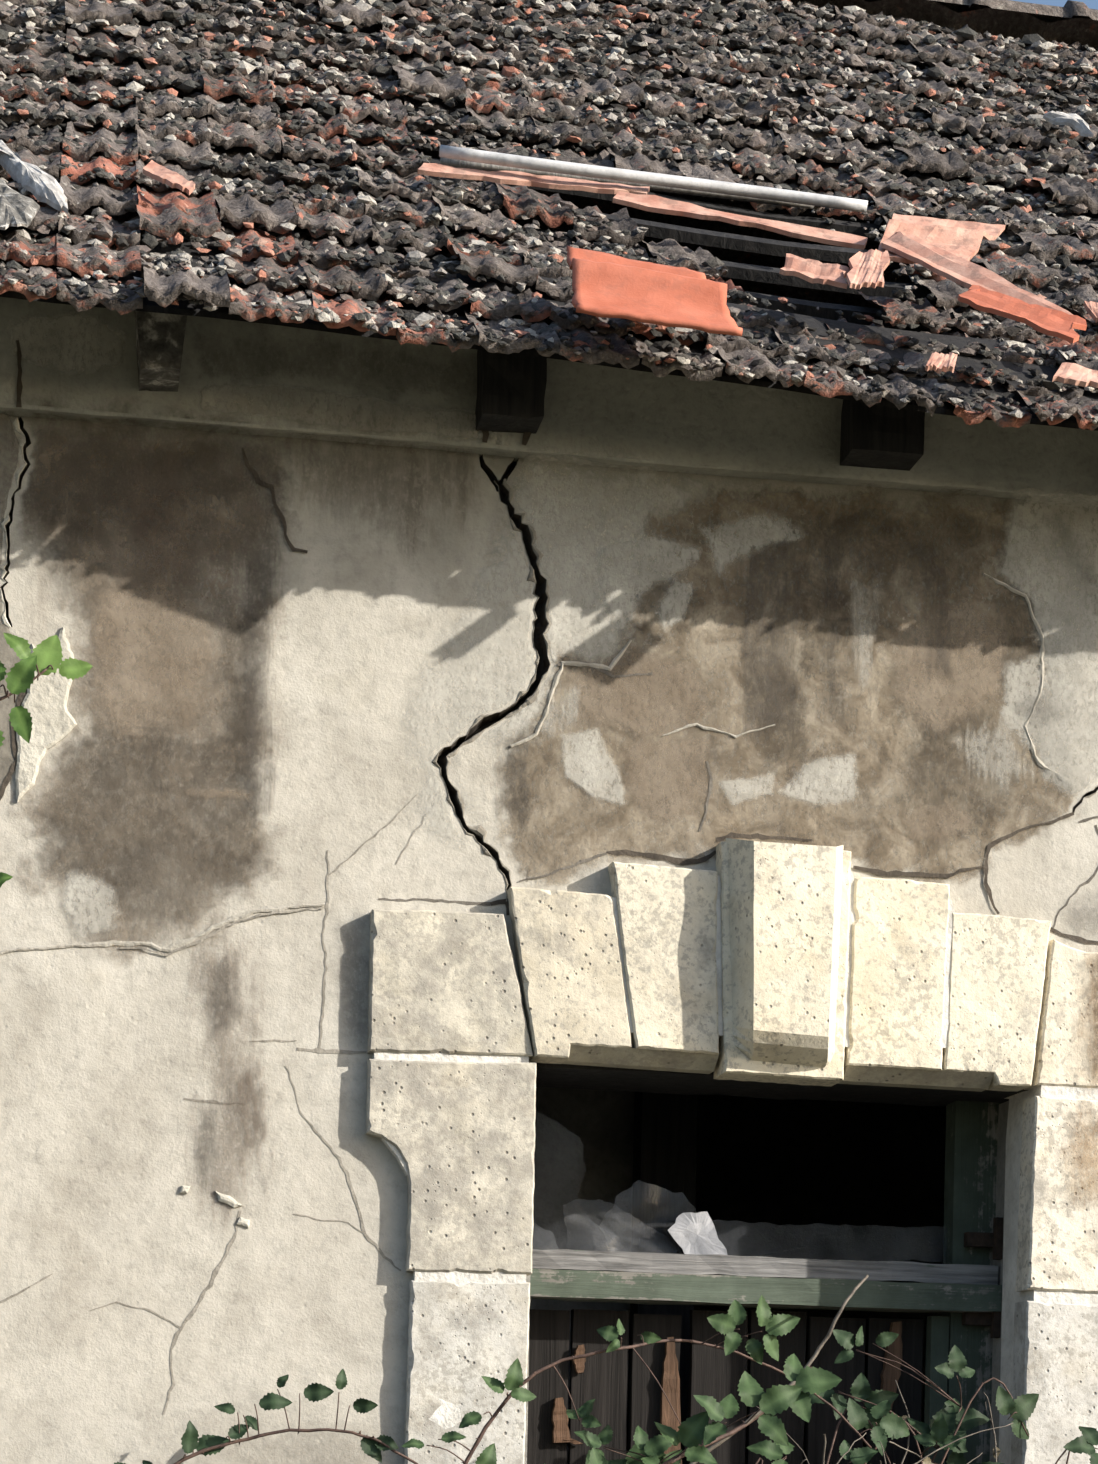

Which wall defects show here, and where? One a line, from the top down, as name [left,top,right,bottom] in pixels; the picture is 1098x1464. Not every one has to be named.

crack [0,340,31,628]
water stain [26,424,279,950]
peeling [502,488,1075,883]
crack [0,430,812,1271]
crack [853,786,1098,944]
crack [0,1274,52,1303]
crack [90,1211,241,1415]